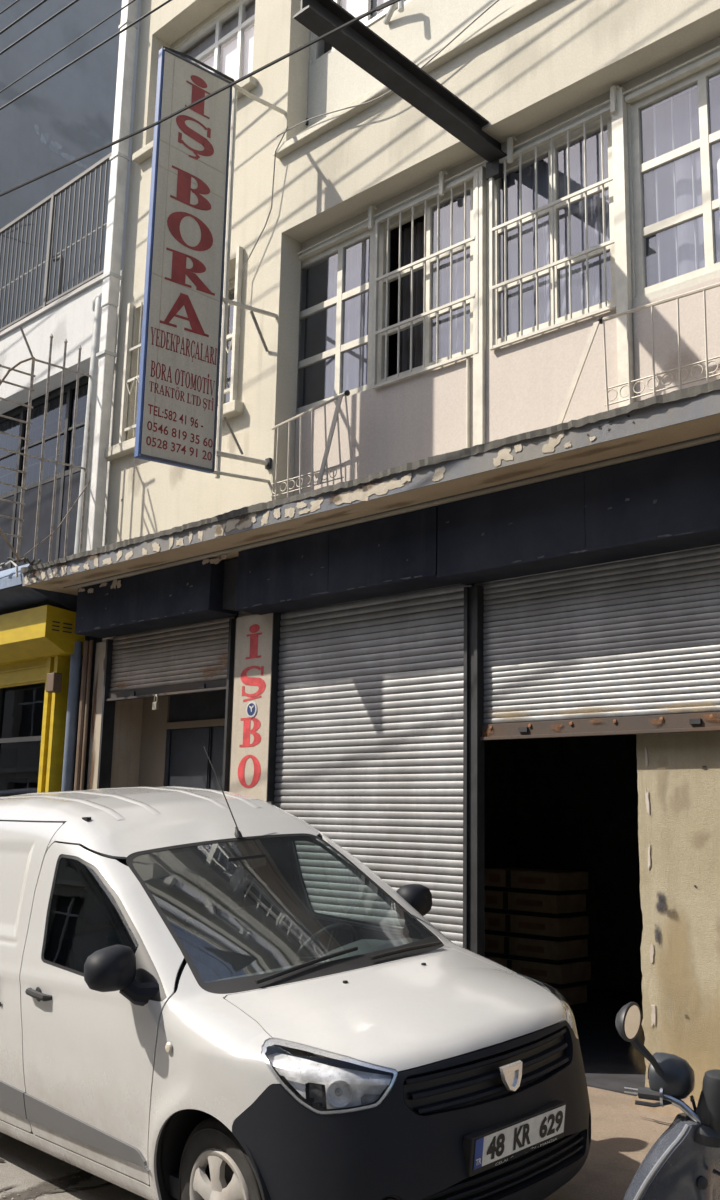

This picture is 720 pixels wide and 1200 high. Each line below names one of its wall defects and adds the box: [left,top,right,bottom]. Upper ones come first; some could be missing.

peeling [542,430,572,453]
peeling [493,444,522,467]
peeling [432,466,446,482]
peeling [25,473,412,584]
spalling [78,579,121,609]
leakage [656,893,676,918]